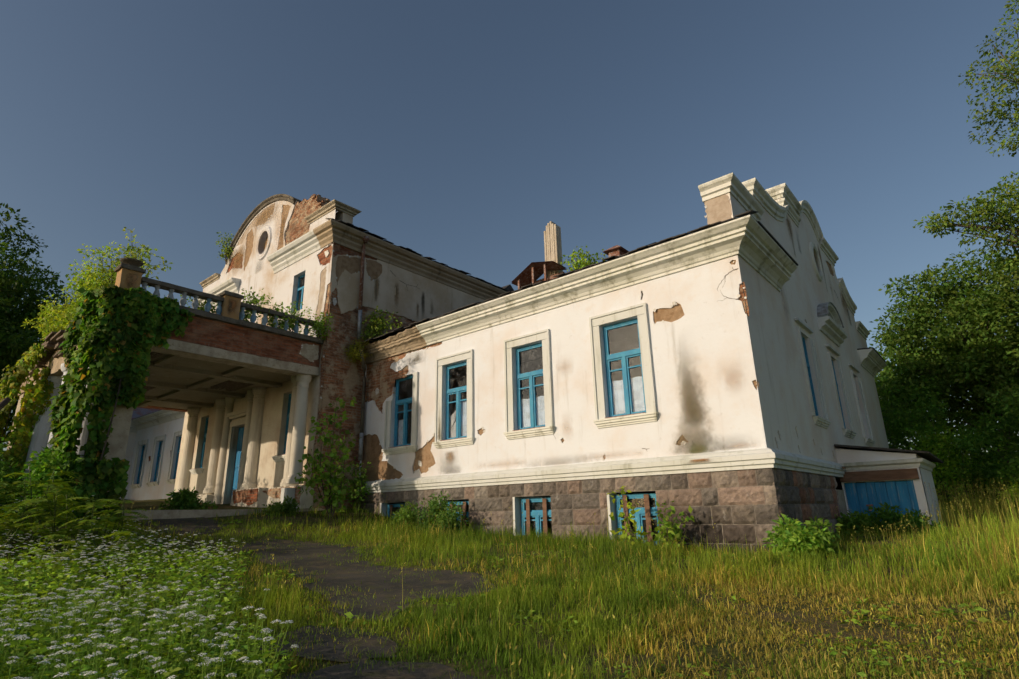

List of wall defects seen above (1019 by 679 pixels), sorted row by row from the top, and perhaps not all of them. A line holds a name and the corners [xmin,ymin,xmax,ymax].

spalling [226,194,331,273]
spalling [653,301,685,323]
flaking render [232,242,442,509]